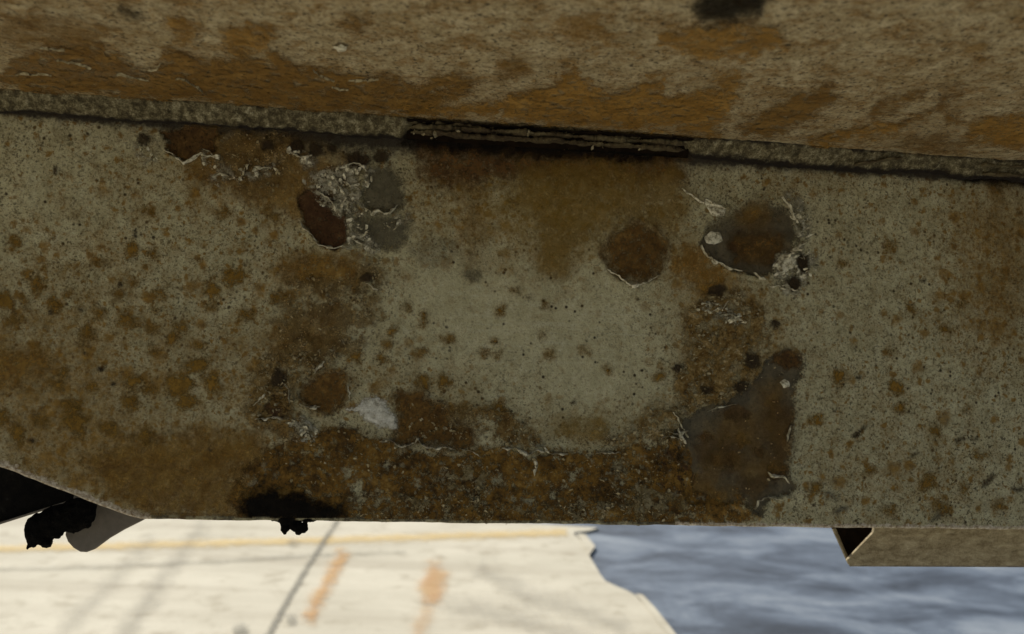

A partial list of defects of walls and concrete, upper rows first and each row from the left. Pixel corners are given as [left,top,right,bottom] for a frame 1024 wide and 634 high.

rust [734,81,968,149]
peeling [136,124,413,259]
peeling [599,221,671,288]
peeling [682,188,819,292]
rust [0,265,74,331]
rust [79,289,188,357]
rust [202,268,246,312]
rust [123,343,221,413]
peeling [606,284,807,523]
rust [224,423,754,526]